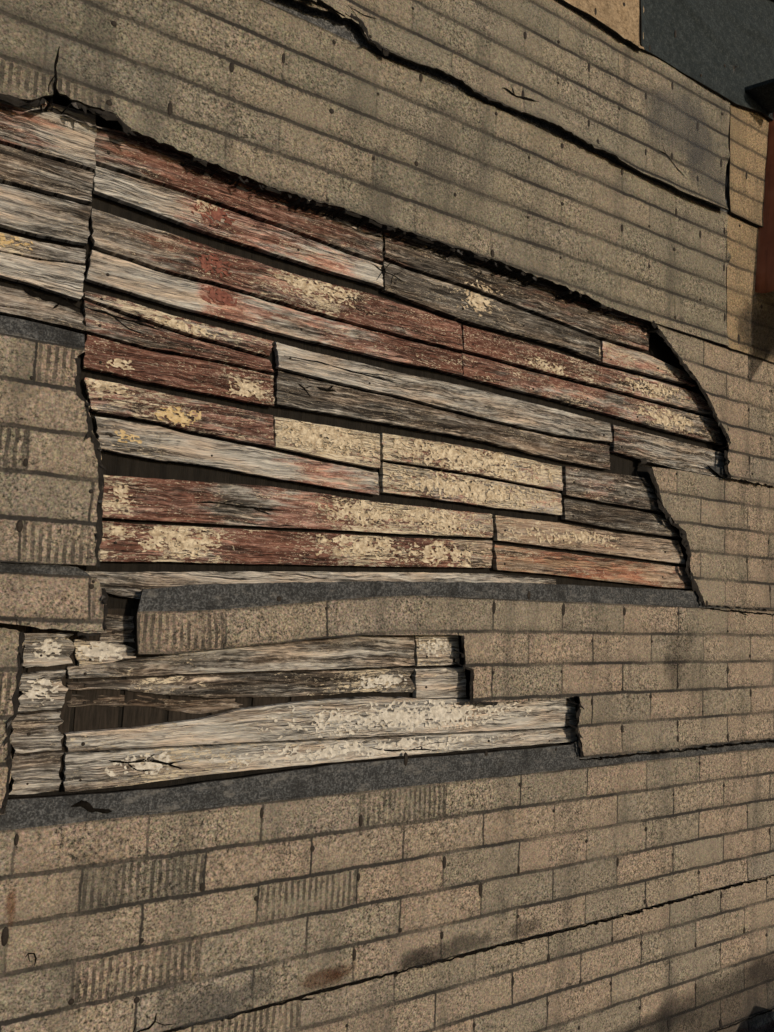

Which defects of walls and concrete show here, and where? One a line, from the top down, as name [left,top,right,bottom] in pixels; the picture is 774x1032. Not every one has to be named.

crack [48,47,66,107]
peeling [273,273,357,308]
peeling [457,280,503,316]
peeling [142,316,222,339]
peeling [85,379,135,406]
peeling [155,405,201,427]
peeling [617,373,729,440]
peeling [269,420,555,567]
peeling [96,484,221,559]
peeling [18,633,127,662]
peeling [208,674,532,769]
peeling [104,751,175,777]